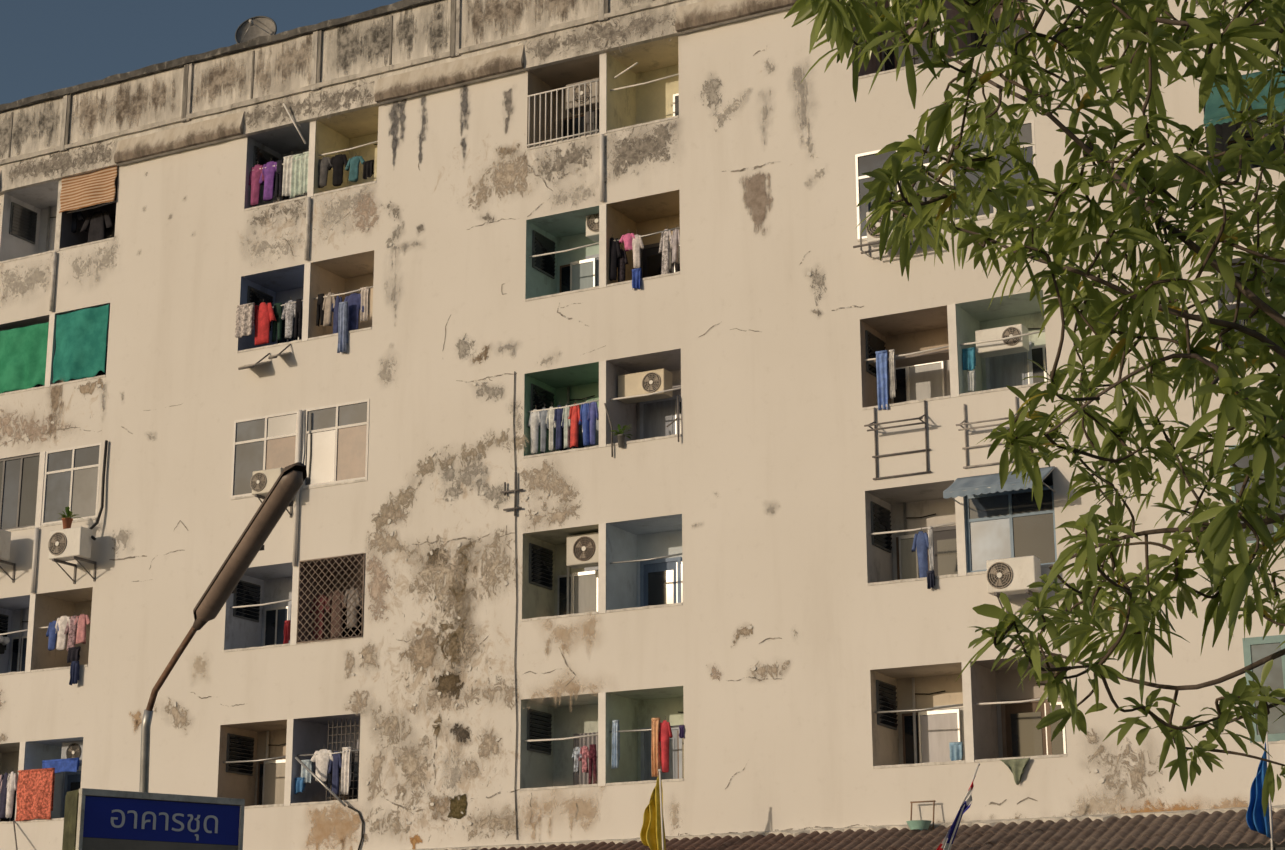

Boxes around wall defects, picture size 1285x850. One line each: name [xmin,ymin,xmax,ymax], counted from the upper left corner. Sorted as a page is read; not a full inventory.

leakage [192,1,448,128]
leakage [467,0,684,65]
leakage [0,78,176,184]
leakage [389,96,426,166]
leakage [460,85,470,157]
leakage [496,89,675,209]
peeling [807,264,827,306]
peeling [456,334,477,359]
peeling [473,381,504,402]
peeling [345,428,580,842]
peeling [732,625,753,646]
peeling [1087,729,1164,810]